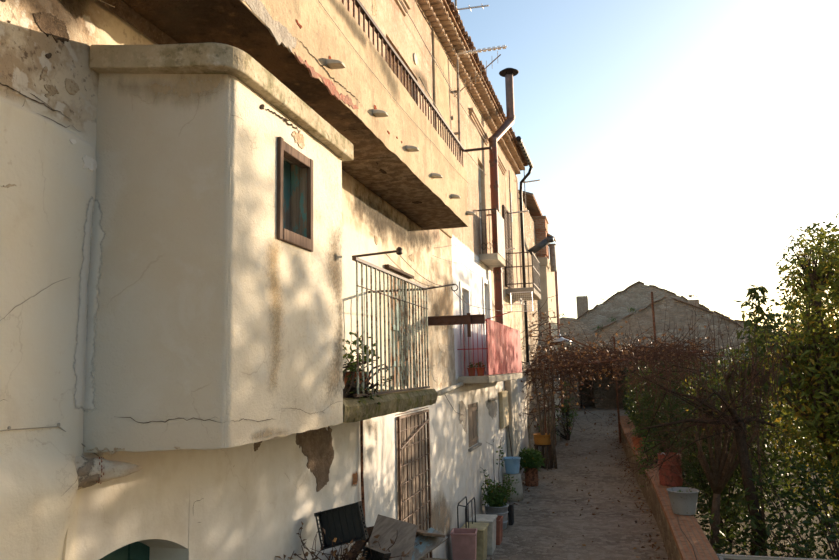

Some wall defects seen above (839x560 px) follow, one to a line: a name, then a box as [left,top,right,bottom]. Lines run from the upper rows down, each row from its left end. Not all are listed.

spalling [32,13,70,44]
damp [22,0,84,34]
spalling [40,53,80,98]
spalling [242,0,359,110]
crack [0,83,80,132]
crack [114,401,341,423]
spalling [296,426,334,492]